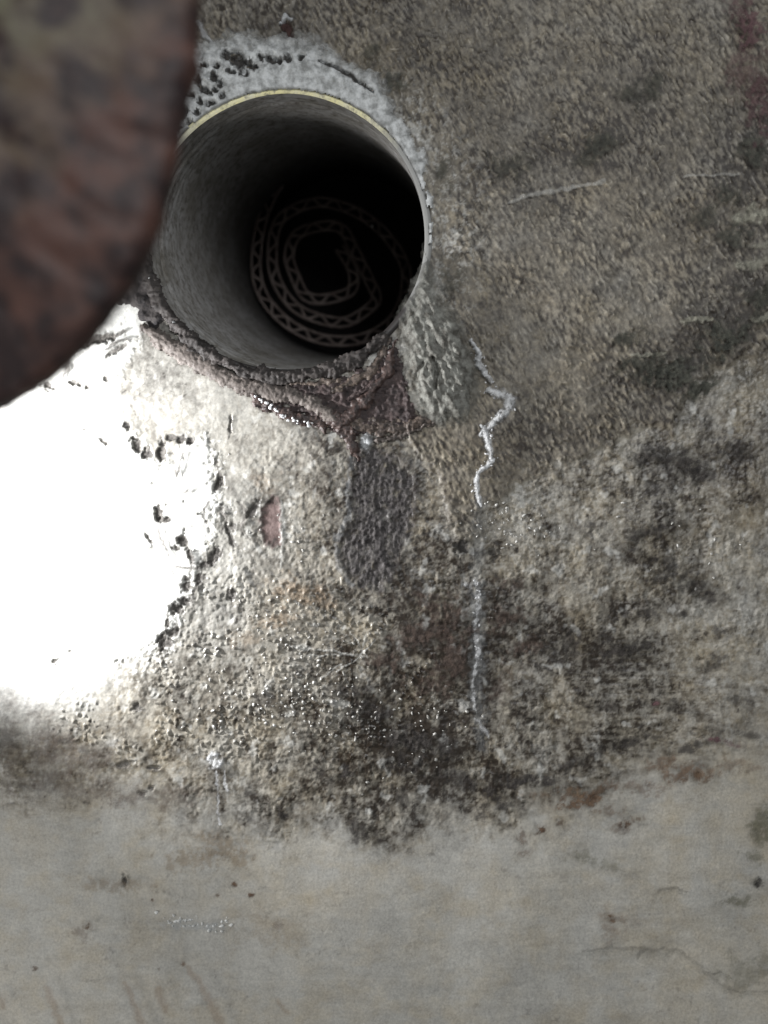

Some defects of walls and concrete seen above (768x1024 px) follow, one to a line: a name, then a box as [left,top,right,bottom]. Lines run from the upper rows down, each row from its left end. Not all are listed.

mould [631,447,717,482]
mould [645,556,717,605]
damp [291,592,477,722]
mould [678,740,708,753]
efflorescence [207,753,228,825]
mould [382,724,663,821]
mould [350,818,381,844]